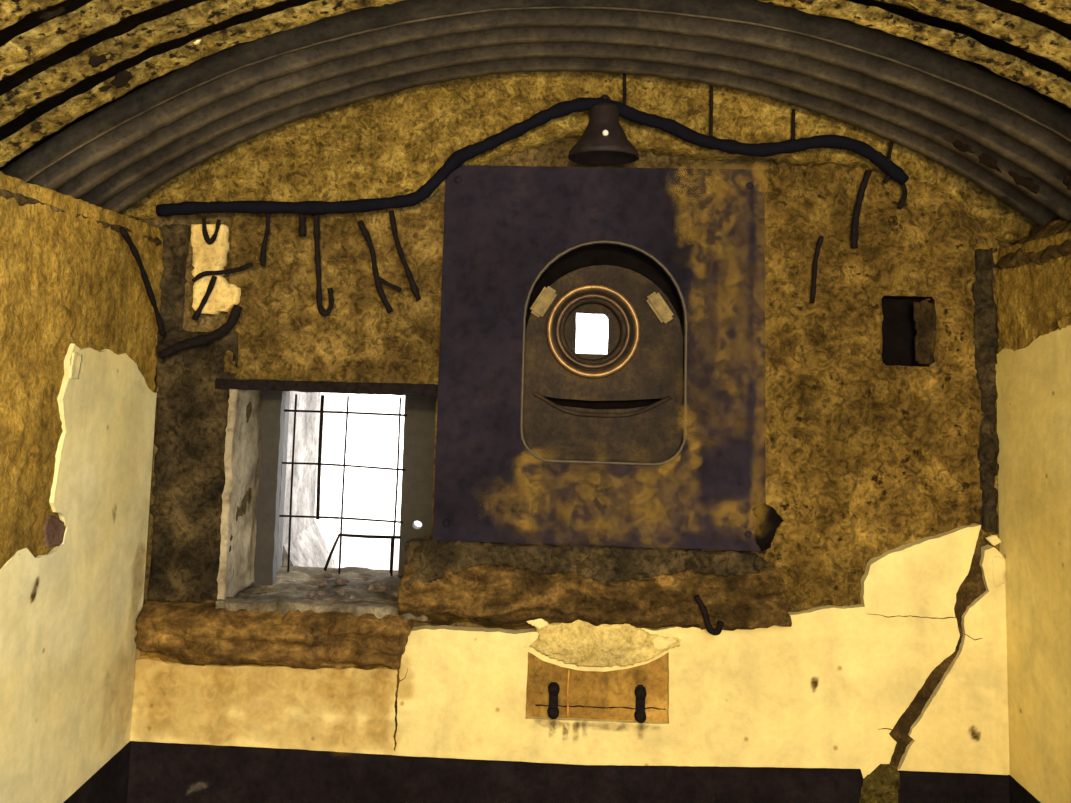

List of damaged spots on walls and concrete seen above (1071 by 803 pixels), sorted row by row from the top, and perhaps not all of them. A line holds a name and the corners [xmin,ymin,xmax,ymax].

flaking render [0,171,444,603]
spalling [397,162,1071,635]
crack [870,247,1006,767]